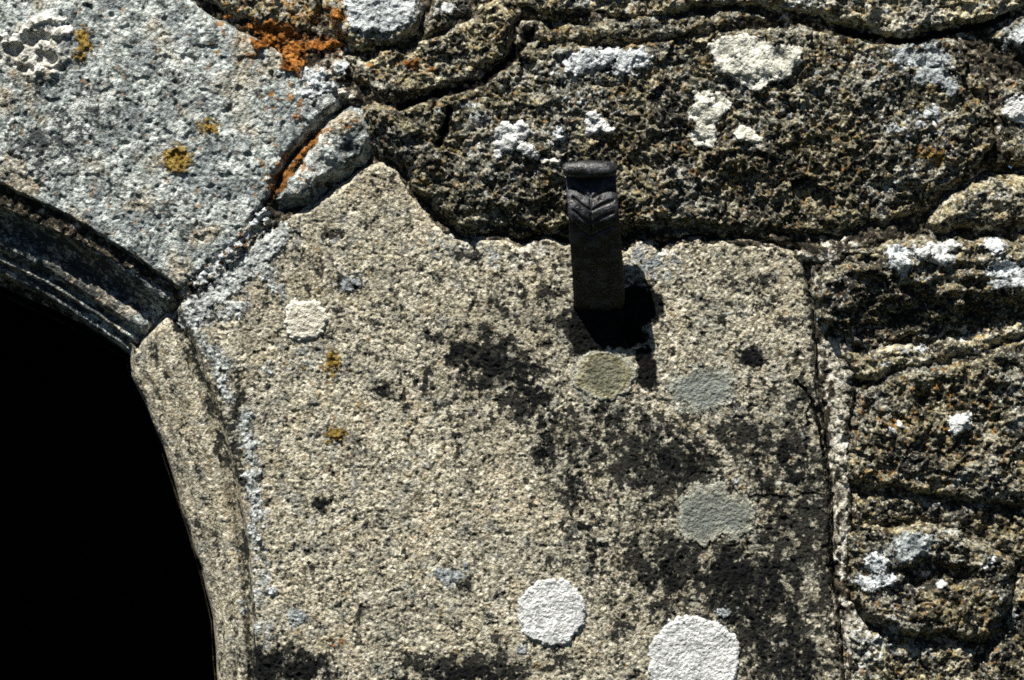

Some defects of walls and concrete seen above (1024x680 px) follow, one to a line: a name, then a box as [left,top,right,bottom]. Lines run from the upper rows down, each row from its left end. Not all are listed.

crack [794,381,825,456]